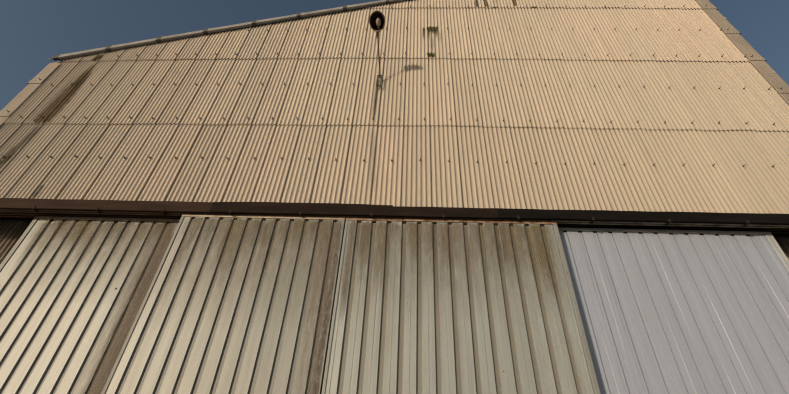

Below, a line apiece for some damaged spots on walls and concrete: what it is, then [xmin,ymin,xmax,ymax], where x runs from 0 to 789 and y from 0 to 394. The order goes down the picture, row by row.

water stain [0,55,103,165]
water stain [84,224,172,394]